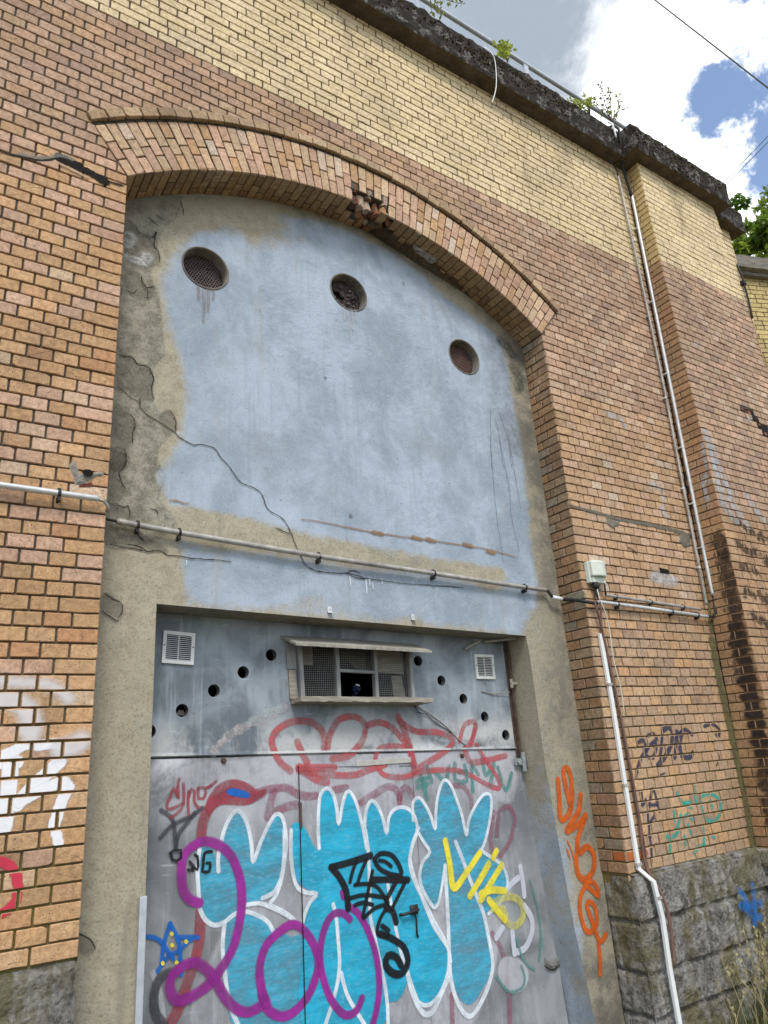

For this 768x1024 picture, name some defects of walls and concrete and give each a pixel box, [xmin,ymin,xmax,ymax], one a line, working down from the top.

spalling [348,184,393,237]
peeling [126,214,161,298]
peeling [118,355,154,399]
peeling [109,405,135,518]
crack [110,386,463,588]
corrosion [301,519,516,557]
leakage [700,428,768,848]